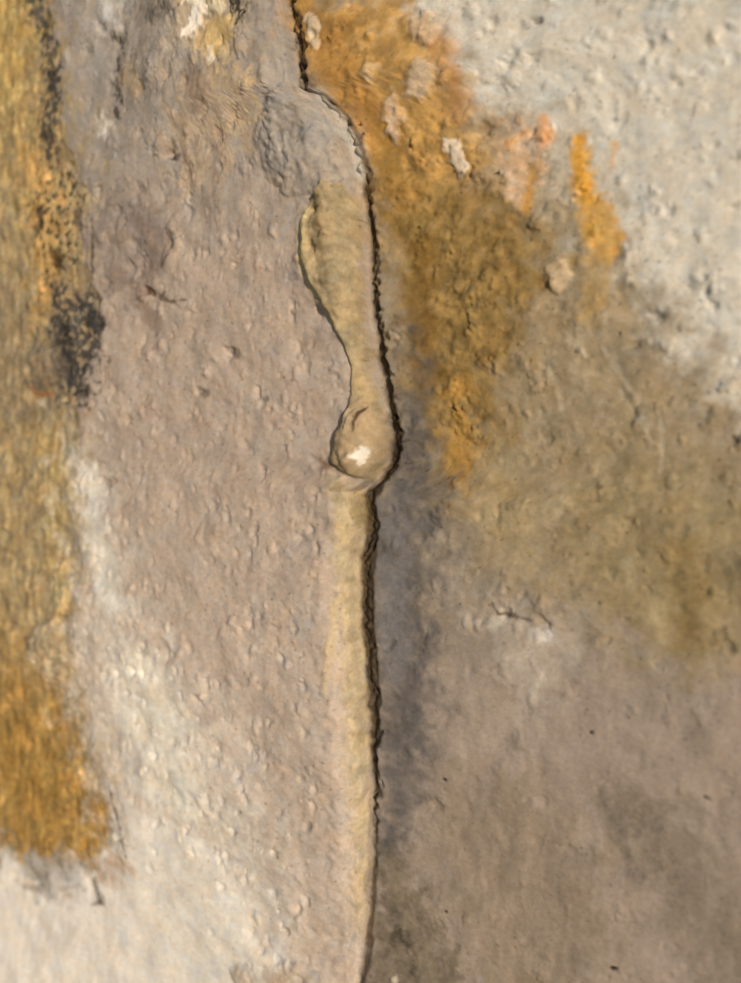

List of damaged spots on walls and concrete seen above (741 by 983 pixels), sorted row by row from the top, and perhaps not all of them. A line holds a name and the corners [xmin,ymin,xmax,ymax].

leakage [0,0,343,983]
crack [287,0,426,983]
rust [268,0,630,521]
leakage [494,92,600,252]
leakage [356,156,741,983]